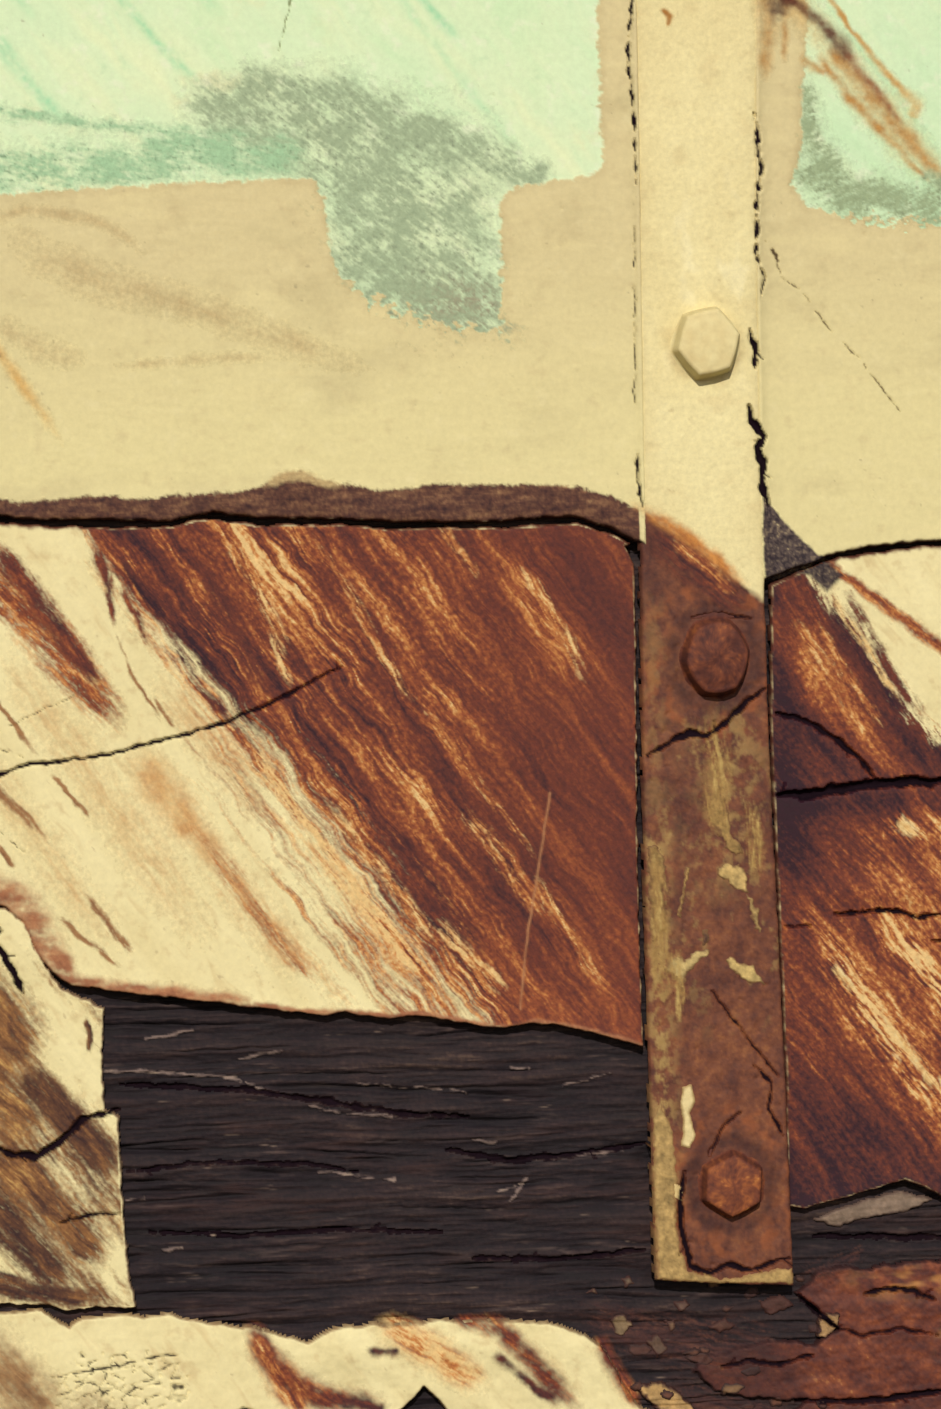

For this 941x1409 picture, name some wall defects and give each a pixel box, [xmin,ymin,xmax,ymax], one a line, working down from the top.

corrosion [659,6,676,28]
corrosion [749,0,941,180]
peeling [0,51,557,361]
crack [0,657,343,779]
corrosion [0,467,754,1041]
crack [644,687,941,803]
corrosion [770,560,941,1208]
crack [0,1081,651,1165]
crack [471,989,941,1407]
peeling [813,1190,932,1227]
peeling [808,1312,840,1338]
peeling [630,1380,695,1409]